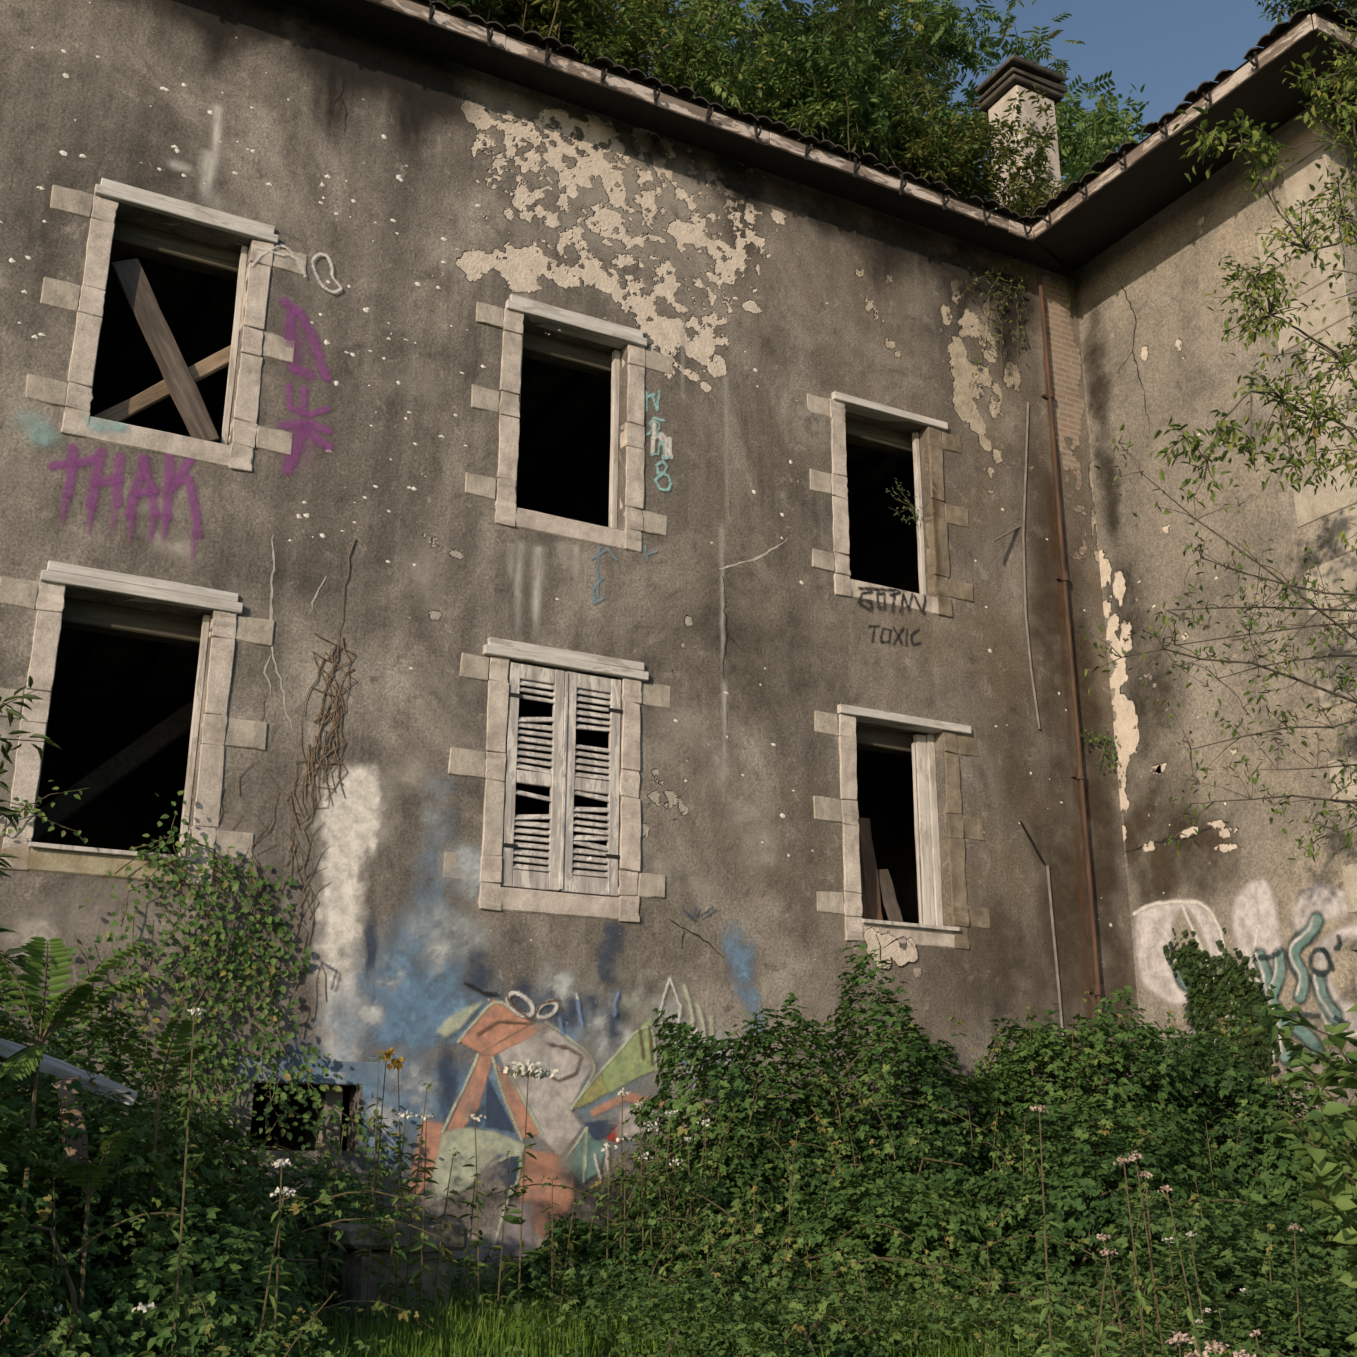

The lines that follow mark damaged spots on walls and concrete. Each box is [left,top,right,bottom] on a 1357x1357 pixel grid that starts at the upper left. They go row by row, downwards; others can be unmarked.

flaking render [415,90,787,398]
flaking render [933,281,1021,494]
damp [1084,344,1109,424]
crack [1117,286,1150,431]
flaking render [1042,276,1168,841]
damp [1096,451,1118,532]
damp [1120,567,1140,641]
flaking render [1142,803,1239,864]
damp [314,766,381,1084]
flaking render [863,926,921,977]